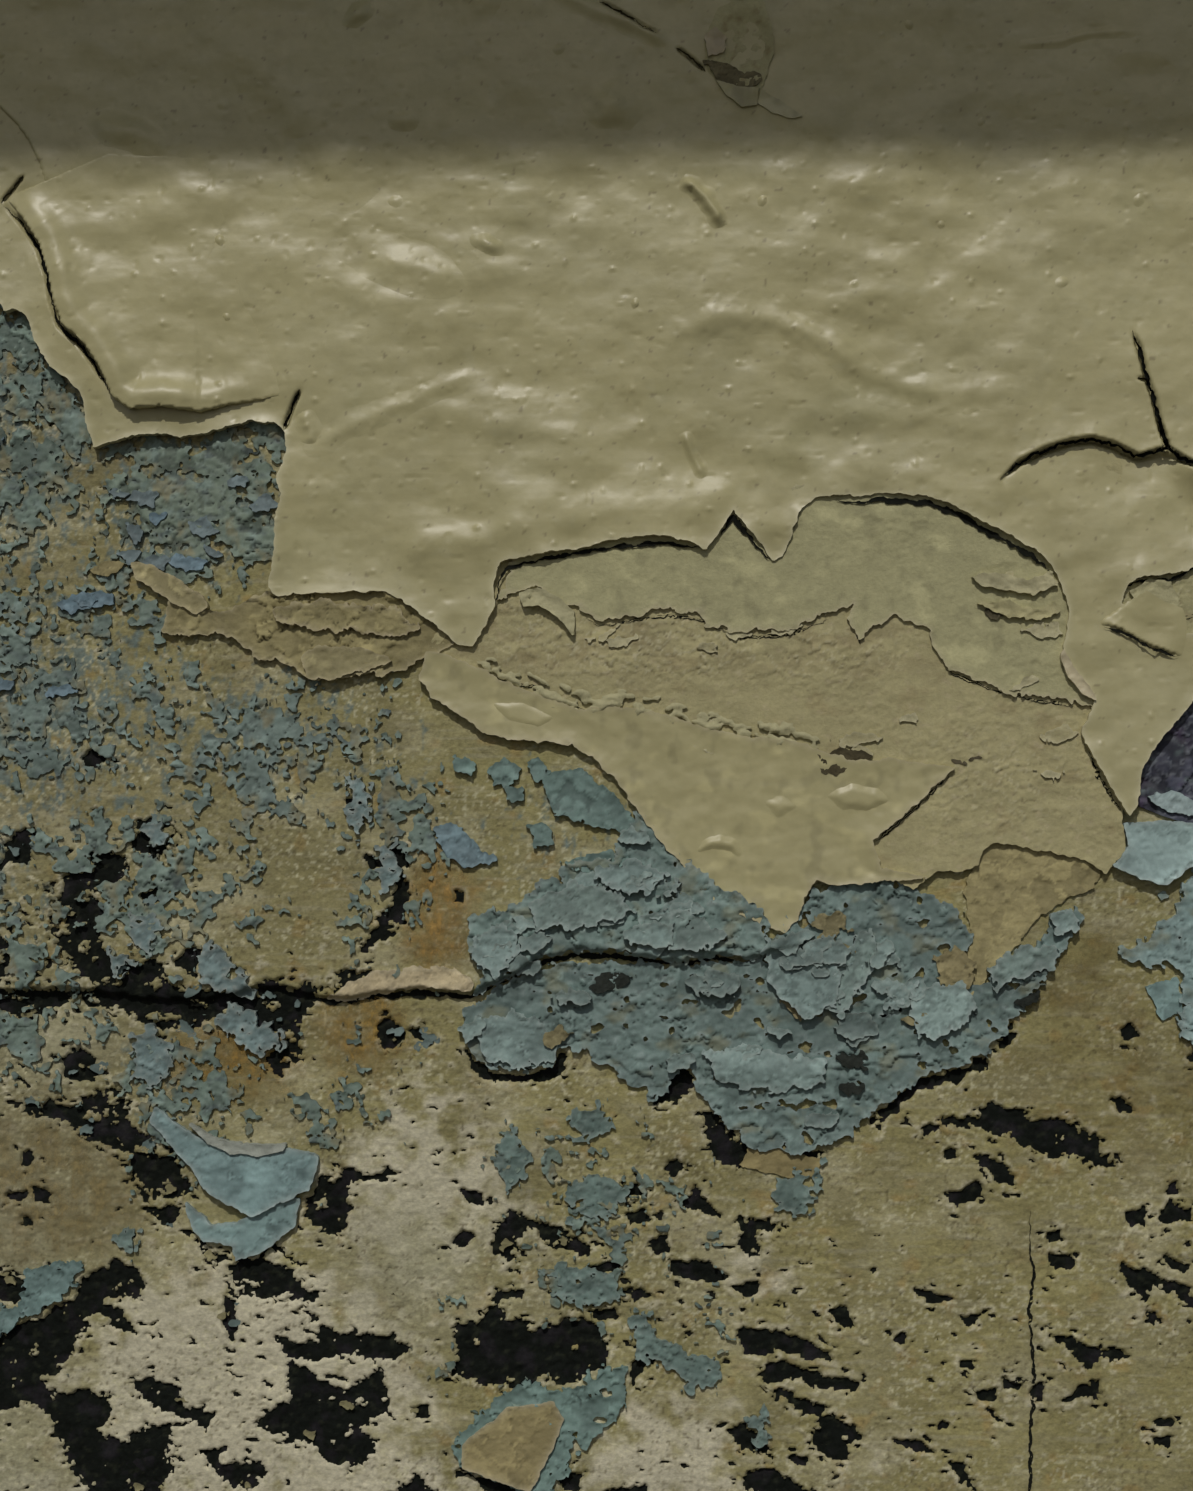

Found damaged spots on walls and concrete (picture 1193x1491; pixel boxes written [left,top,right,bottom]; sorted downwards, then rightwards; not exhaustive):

crack [600,2,705,71]
crack [1,176,106,384]
peeling [8,154,279,413]
crack [1005,331,1193,475]
peeling [0,304,1193,1491]